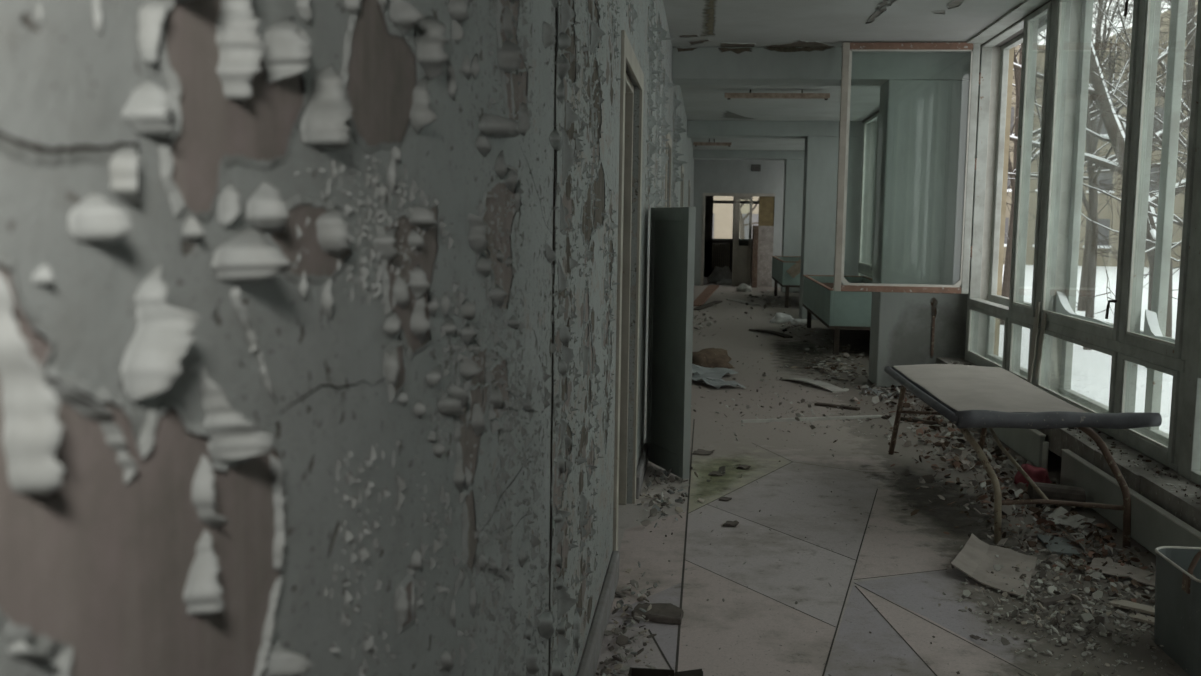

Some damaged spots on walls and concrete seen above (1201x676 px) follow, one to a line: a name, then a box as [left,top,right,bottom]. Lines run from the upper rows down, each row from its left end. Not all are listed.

crack [0,132,140,167]
peeling [0,253,314,676]
peeling [68,0,838,676]
spalling [866,0,897,24]